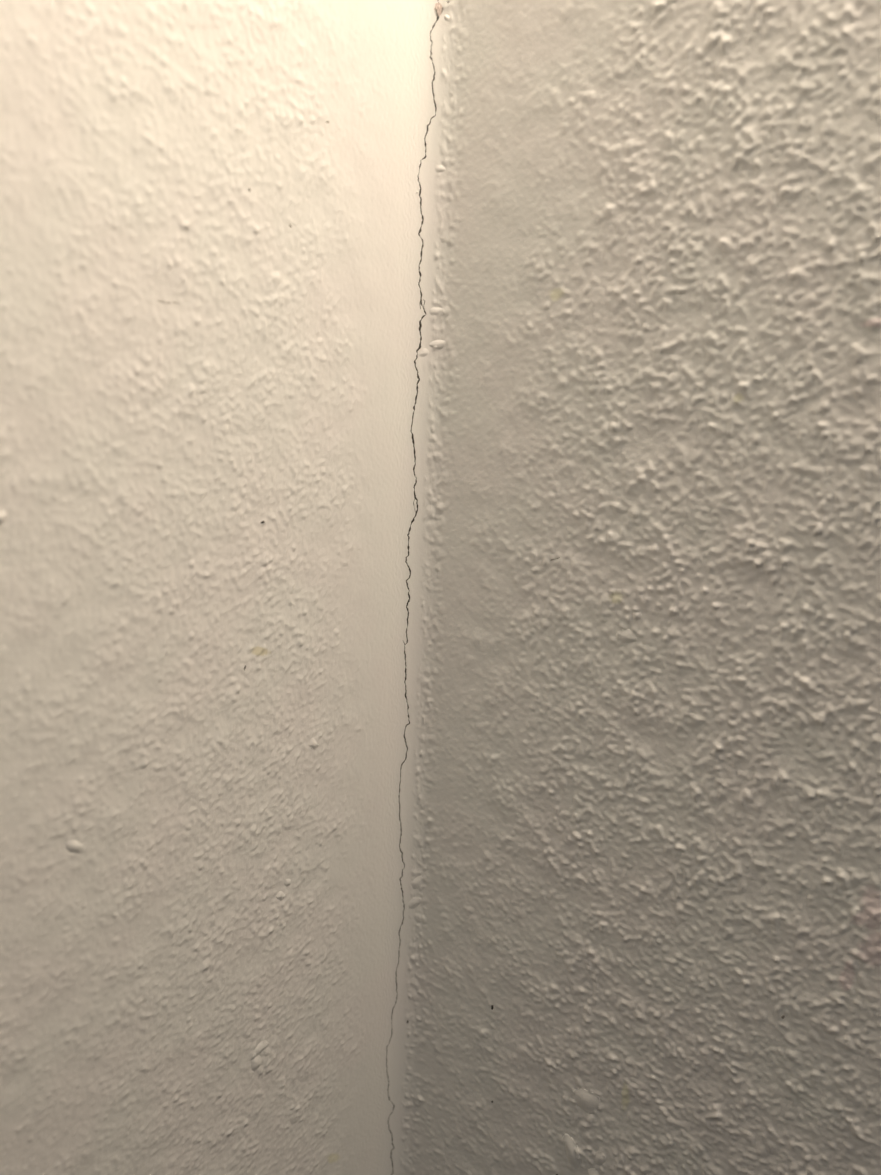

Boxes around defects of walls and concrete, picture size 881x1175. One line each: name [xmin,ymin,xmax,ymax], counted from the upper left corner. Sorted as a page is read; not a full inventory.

crack [386,2,439,1175]